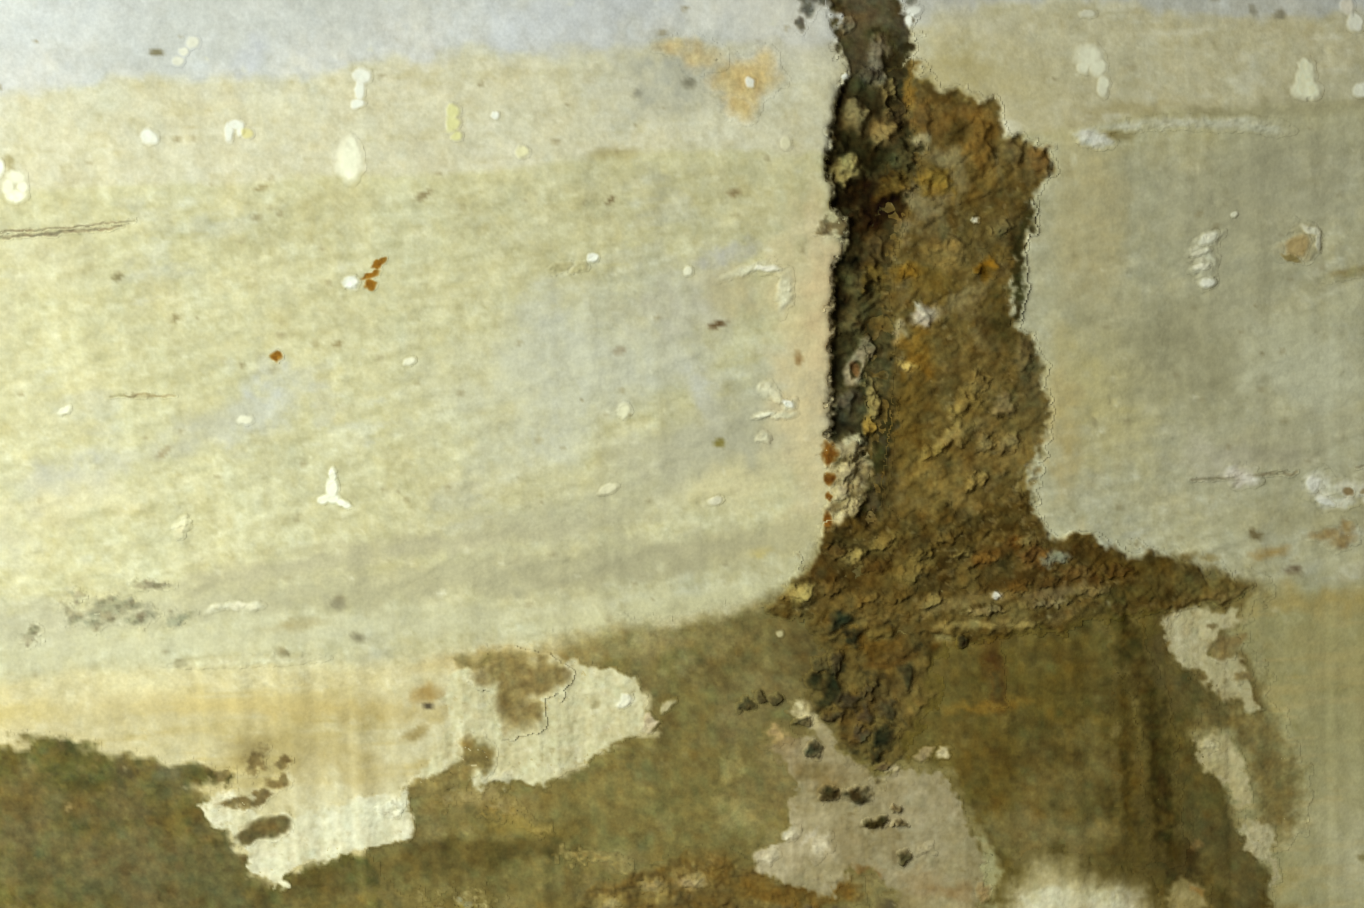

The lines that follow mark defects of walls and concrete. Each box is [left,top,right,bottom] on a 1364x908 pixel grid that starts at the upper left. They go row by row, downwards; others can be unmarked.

rust [359,256,388,293]
rust [814,438,843,533]
spalling [734,56,1299,908]
leakage [0,539,826,908]
peeling [194,656,678,893]
leakage [901,545,1314,908]
peeling [1189,725,1283,894]